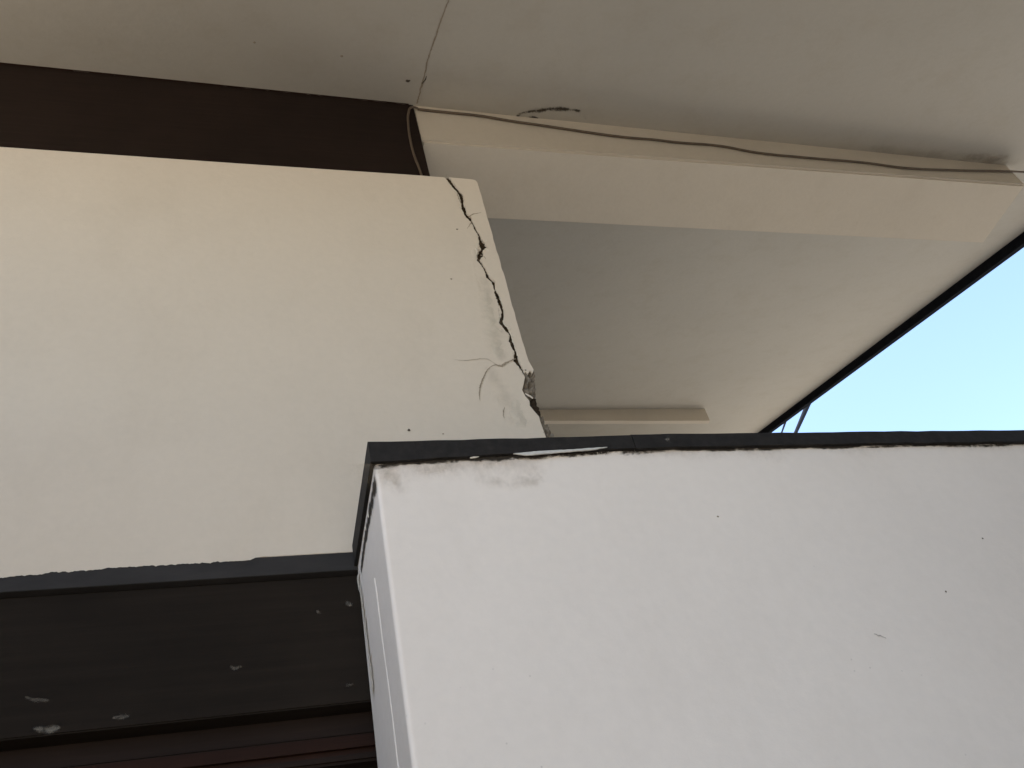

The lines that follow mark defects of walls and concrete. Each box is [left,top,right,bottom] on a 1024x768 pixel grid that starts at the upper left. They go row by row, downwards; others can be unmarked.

crack [416,0,449,104]
crack [447,178,524,399]
spalling [448,177,554,437]